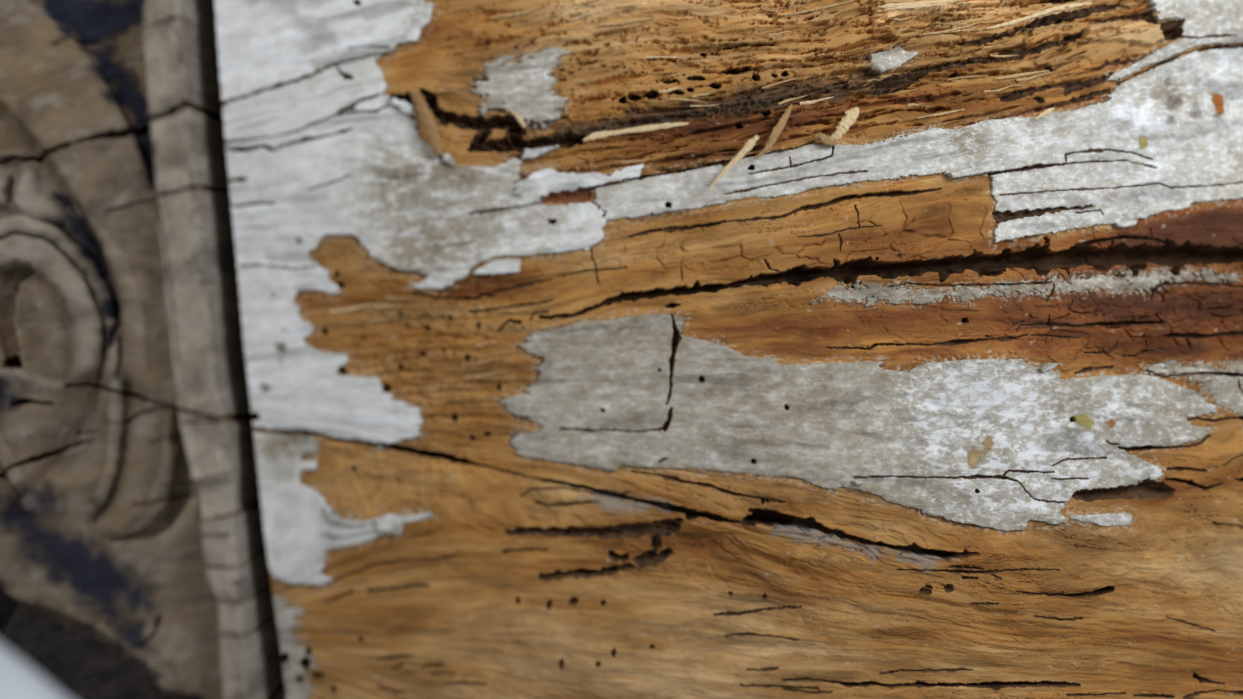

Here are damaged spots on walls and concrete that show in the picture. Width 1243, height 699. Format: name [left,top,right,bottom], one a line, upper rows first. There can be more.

crack [0,46,396,213]
peeling [214,0,1243,586]
crack [0,141,1243,638]
crack [144,616,162,642]
crack [268,681,287,699]
peeling [272,591,321,699]